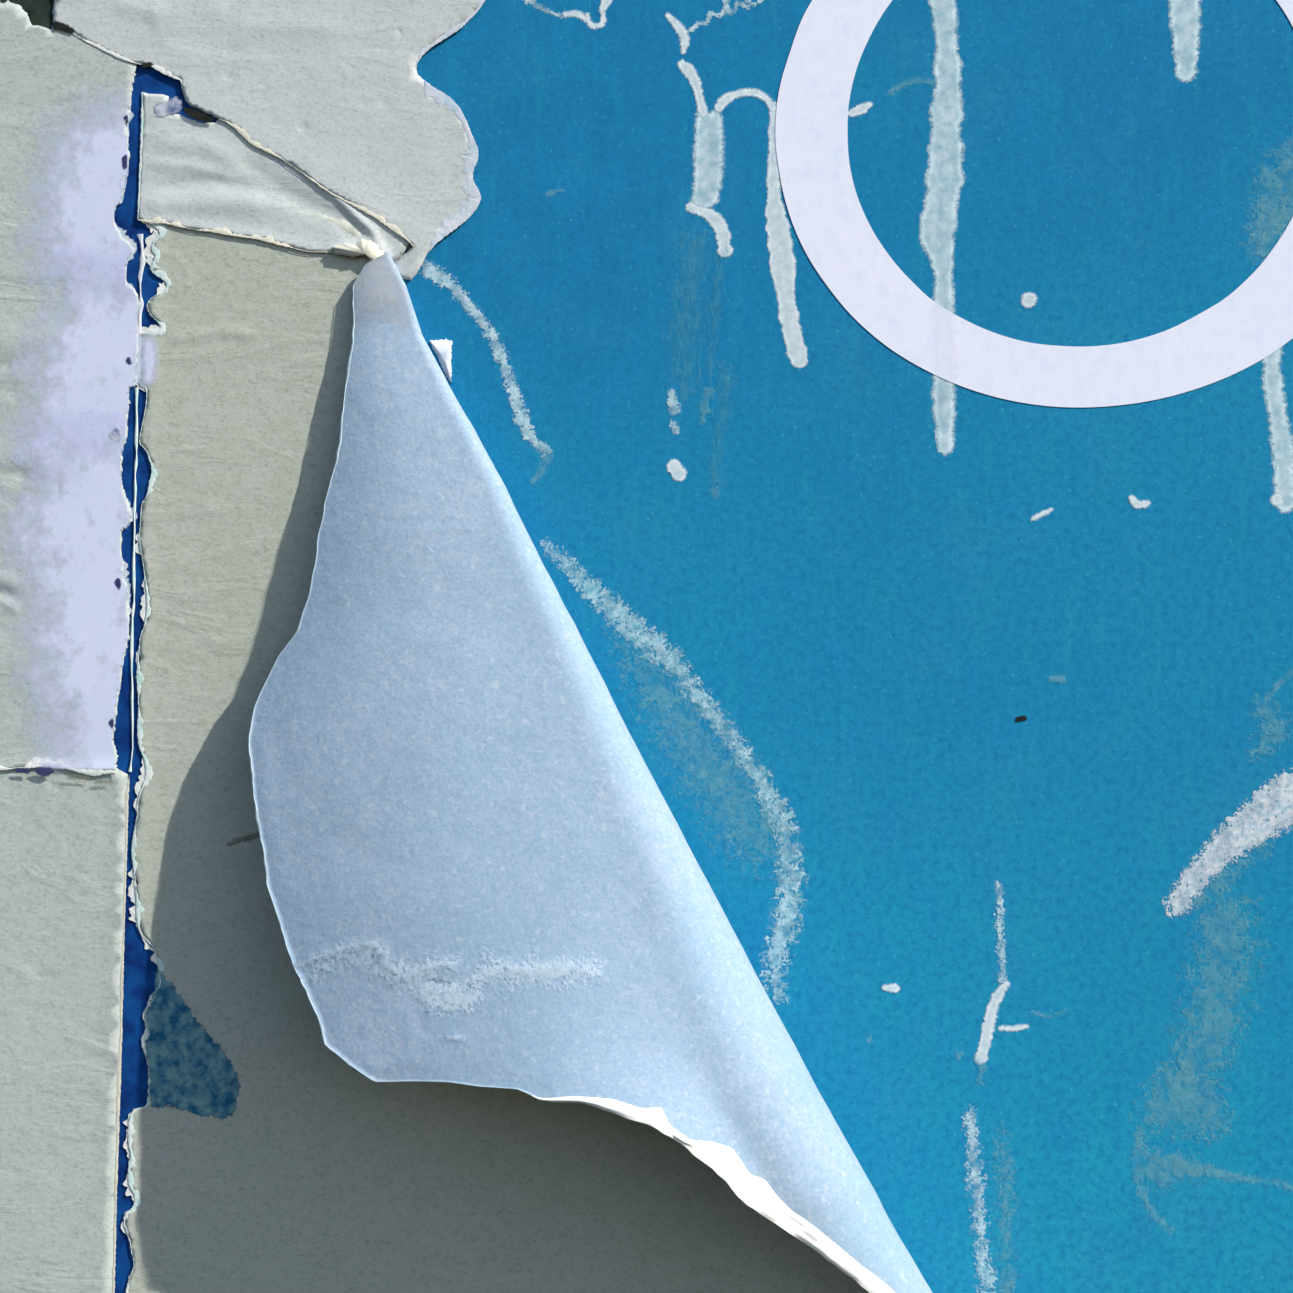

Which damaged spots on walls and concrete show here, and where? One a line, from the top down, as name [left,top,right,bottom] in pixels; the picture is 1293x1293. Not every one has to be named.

peeling [52,21,74,34]
peeling [184,108,214,122]
peeling [419,262,444,289]
peeling [667,389,681,434]
peeling [109,428,121,442]
peeling [299,946,606,1016]